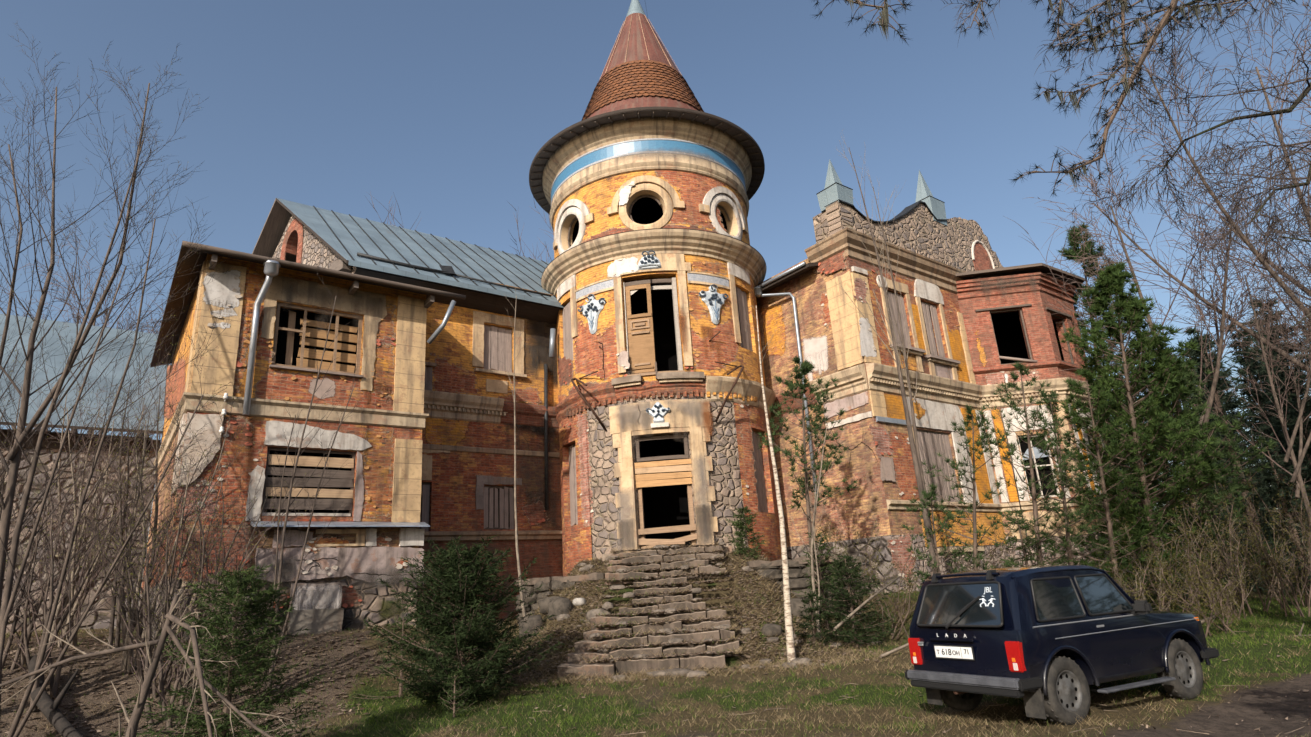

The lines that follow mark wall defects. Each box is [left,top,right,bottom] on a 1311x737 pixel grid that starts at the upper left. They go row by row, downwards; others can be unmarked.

flaking render [203,269,396,411]
flaking render [168,415,266,582]
flaking render [362,428,394,518]
flaking render [296,536,392,629]